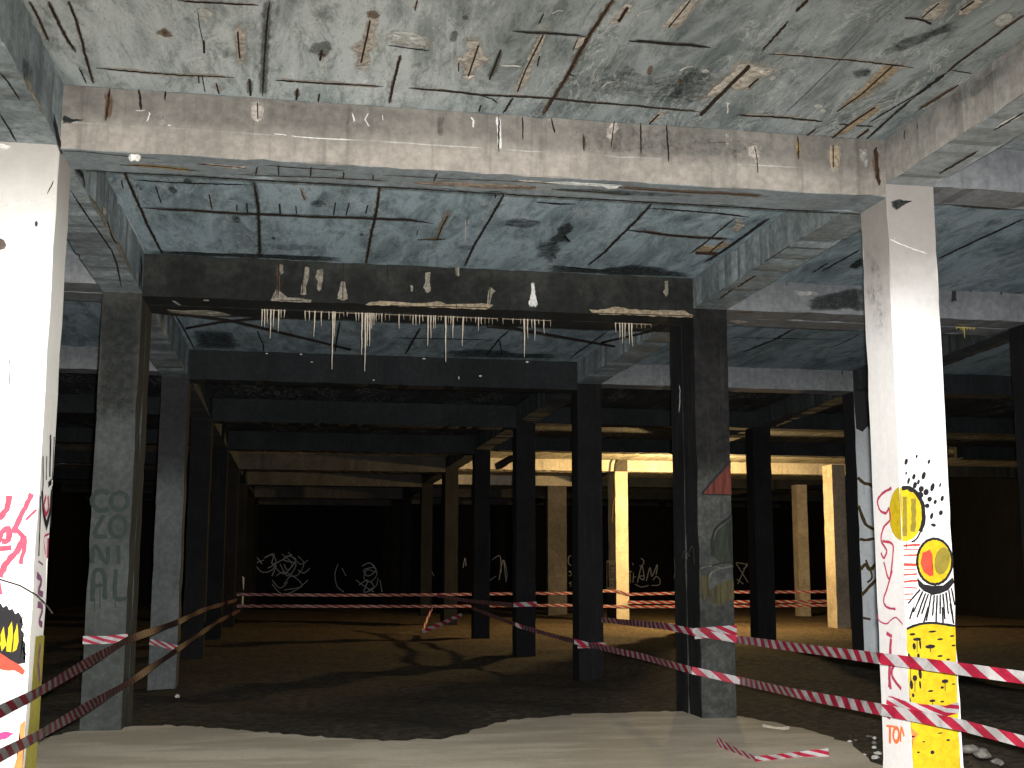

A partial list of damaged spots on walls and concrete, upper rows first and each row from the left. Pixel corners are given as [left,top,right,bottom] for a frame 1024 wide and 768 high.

spalling [662,0,697,28]
spalling [353,17,426,70]
spalling [458,41,502,80]
spalling [699,63,776,116]
spalling [814,65,898,112]
spalling [366,272,495,309]
water stain [304,283,551,371]
water stain [615,322,651,346]
spalling [589,307,693,317]